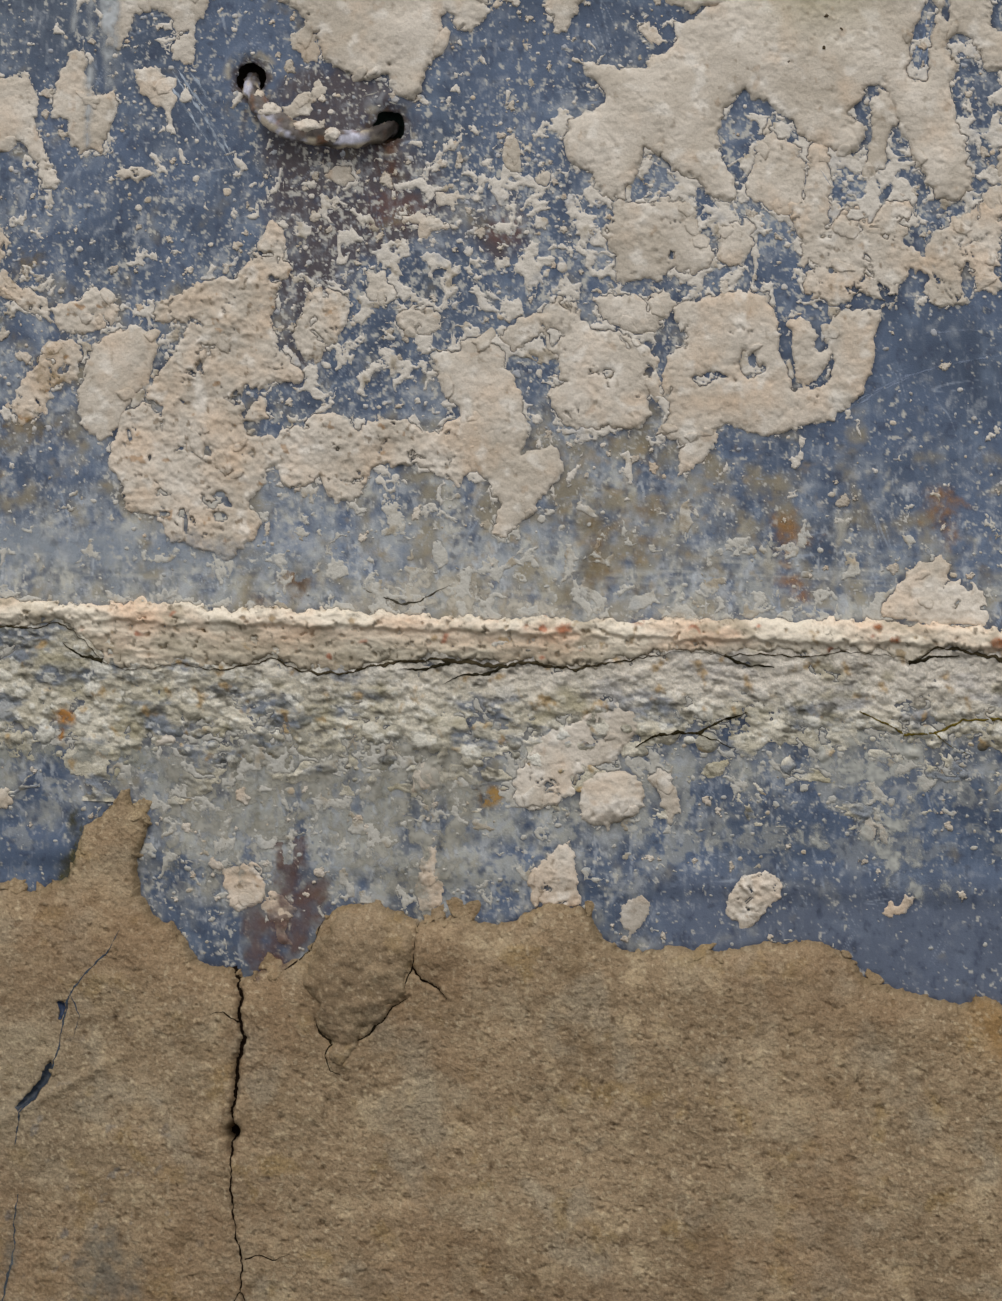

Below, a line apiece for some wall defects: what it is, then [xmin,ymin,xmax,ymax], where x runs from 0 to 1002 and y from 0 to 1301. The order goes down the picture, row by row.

peeling [0,0,1002,561]
peeling [881,555,989,626]
crack [0,622,1002,683]
crack [635,712,747,749]
crack [860,711,1002,754]
peeling [222,861,297,945]
rust [244,836,329,966]
peeling [527,841,581,908]
peeling [619,895,650,939]
peeling [726,870,783,929]
crack [15,932,118,1143]
crack [212,966,287,1301]